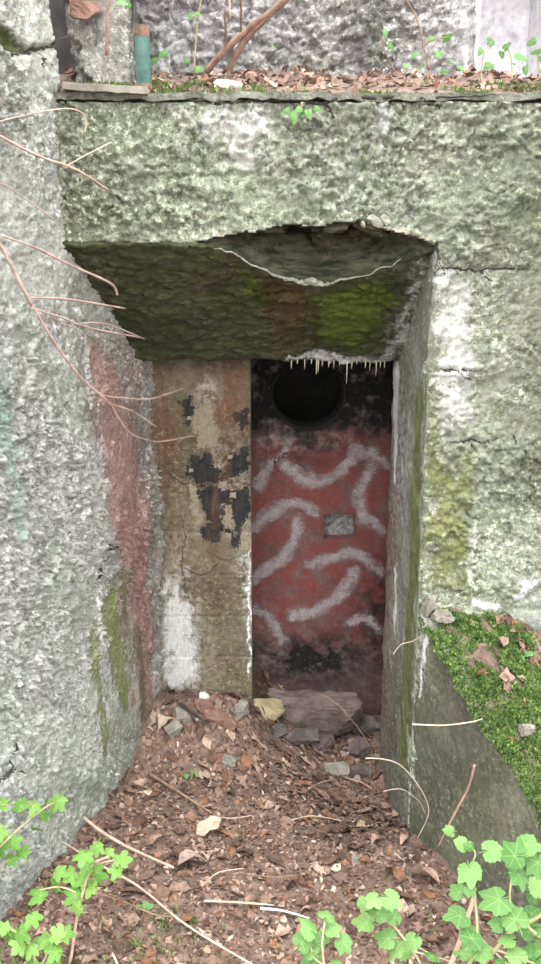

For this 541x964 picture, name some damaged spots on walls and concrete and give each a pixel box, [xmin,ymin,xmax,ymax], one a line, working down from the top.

leakage [72,306,112,499]
peeling [177,395,251,555]
leakage [288,283,420,486]
leakage [89,567,148,757]
crack [0,742,25,782]